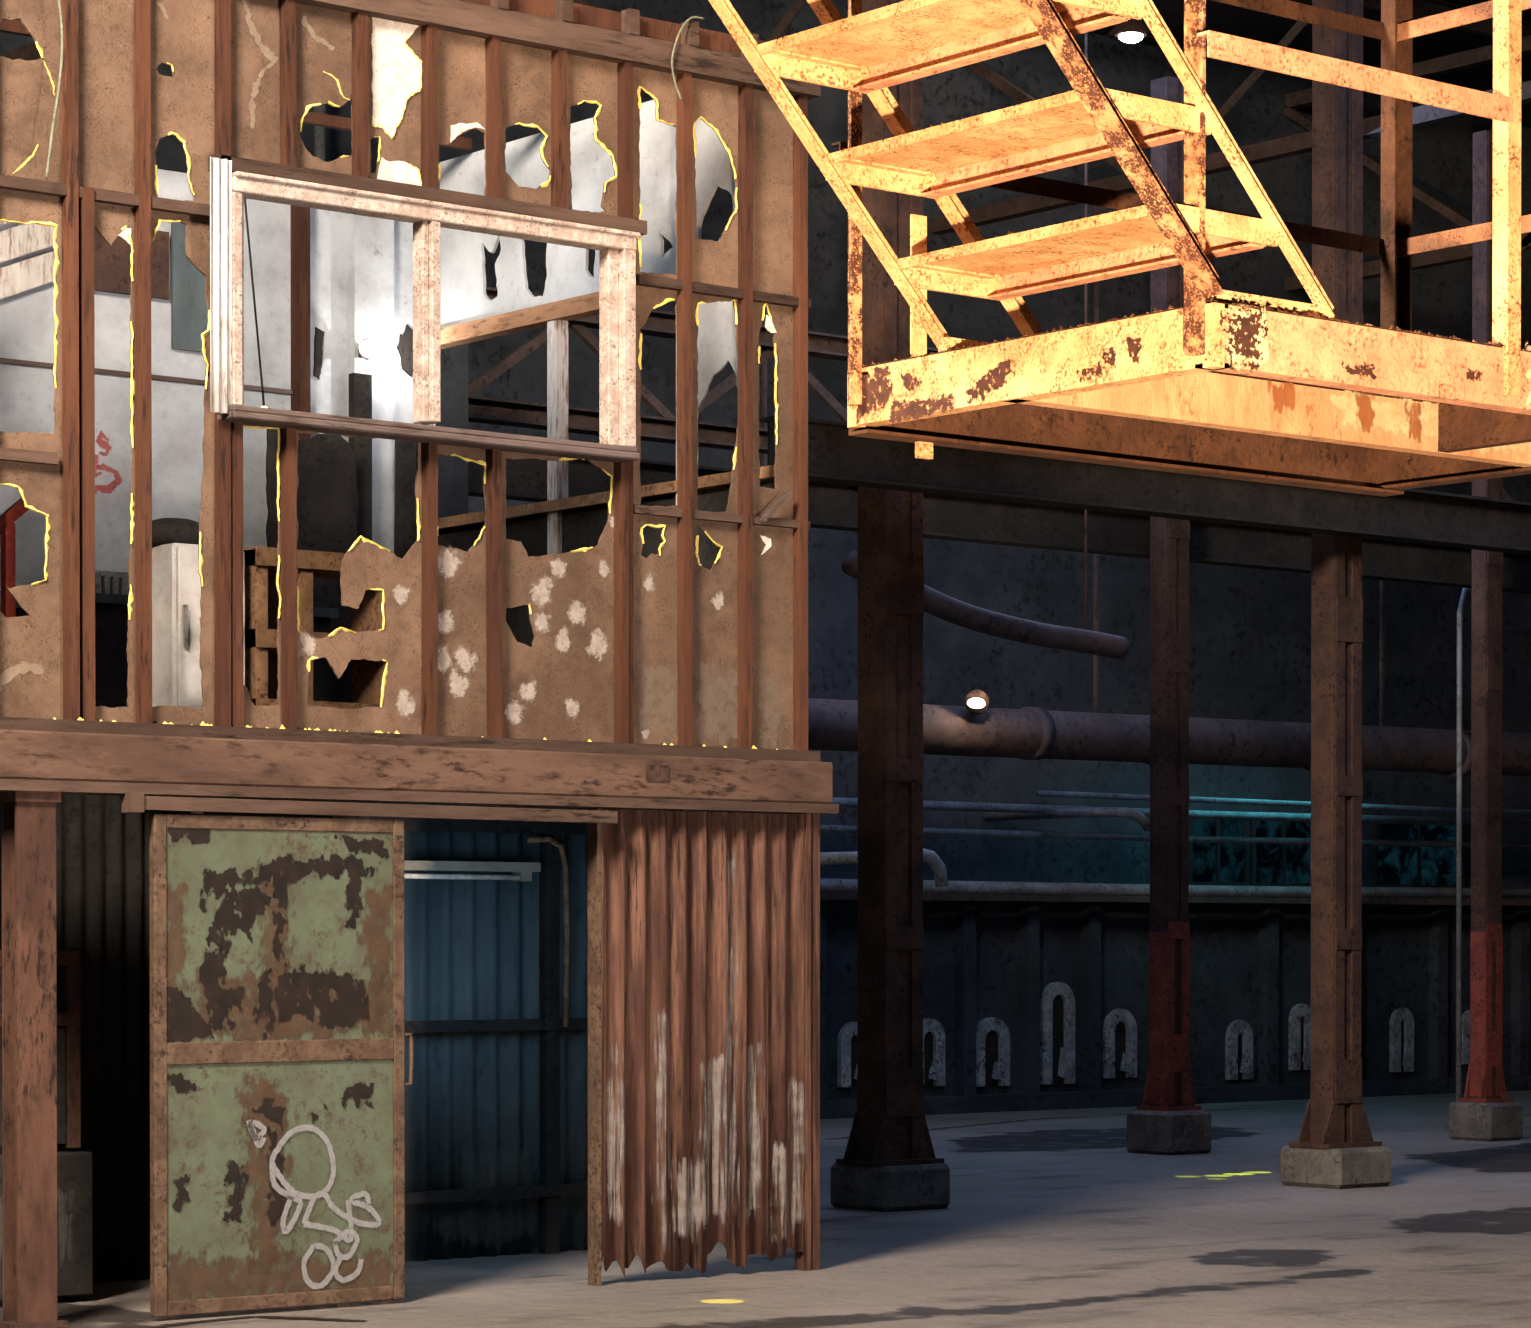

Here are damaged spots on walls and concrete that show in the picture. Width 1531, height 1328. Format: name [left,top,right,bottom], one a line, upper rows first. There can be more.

corrosion [1268,381,1295,413]
corrosion [1356,394,1375,432]
corrosion [1405,402,1421,442]
peeling [167,828,210,844]
peeling [167,834,389,1043]
leakage [656,854,805,1245]
peeling [167,1072,197,1094]
peeling [311,1082,374,1124]
peeling [252,1098,290,1226]
leakage [606,1080,625,1223]
peeling [172,1174,190,1212]
peeling [222,1160,249,1225]